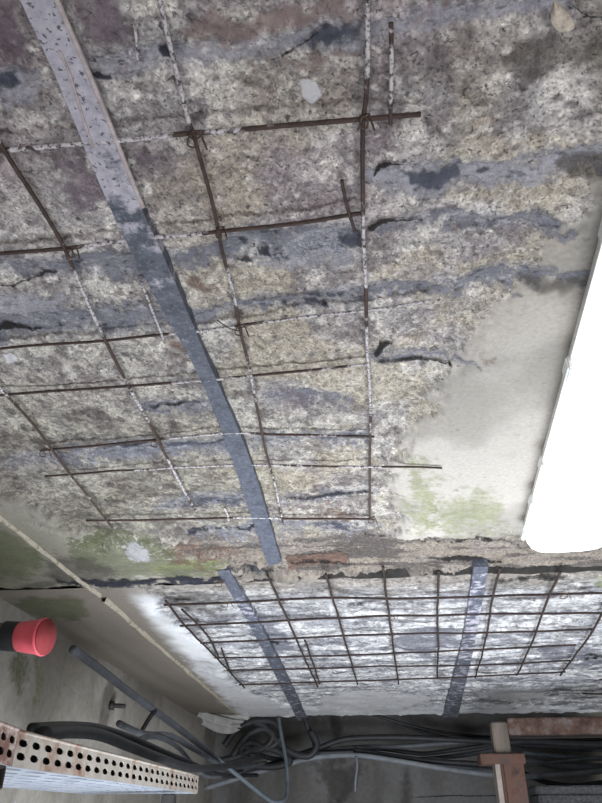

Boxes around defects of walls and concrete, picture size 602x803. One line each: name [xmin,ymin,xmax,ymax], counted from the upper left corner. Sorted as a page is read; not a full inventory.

corrosion [71,0,134,44]
corrosion [55,152,106,208]
crack [368,218,423,231]
spalling [365,0,602,466]
crack [0,270,58,287]
spalling [0,0,442,528]
crack [0,322,65,331]
crack [374,342,452,367]
crack [151,401,204,409]
spalling [0,396,602,734]